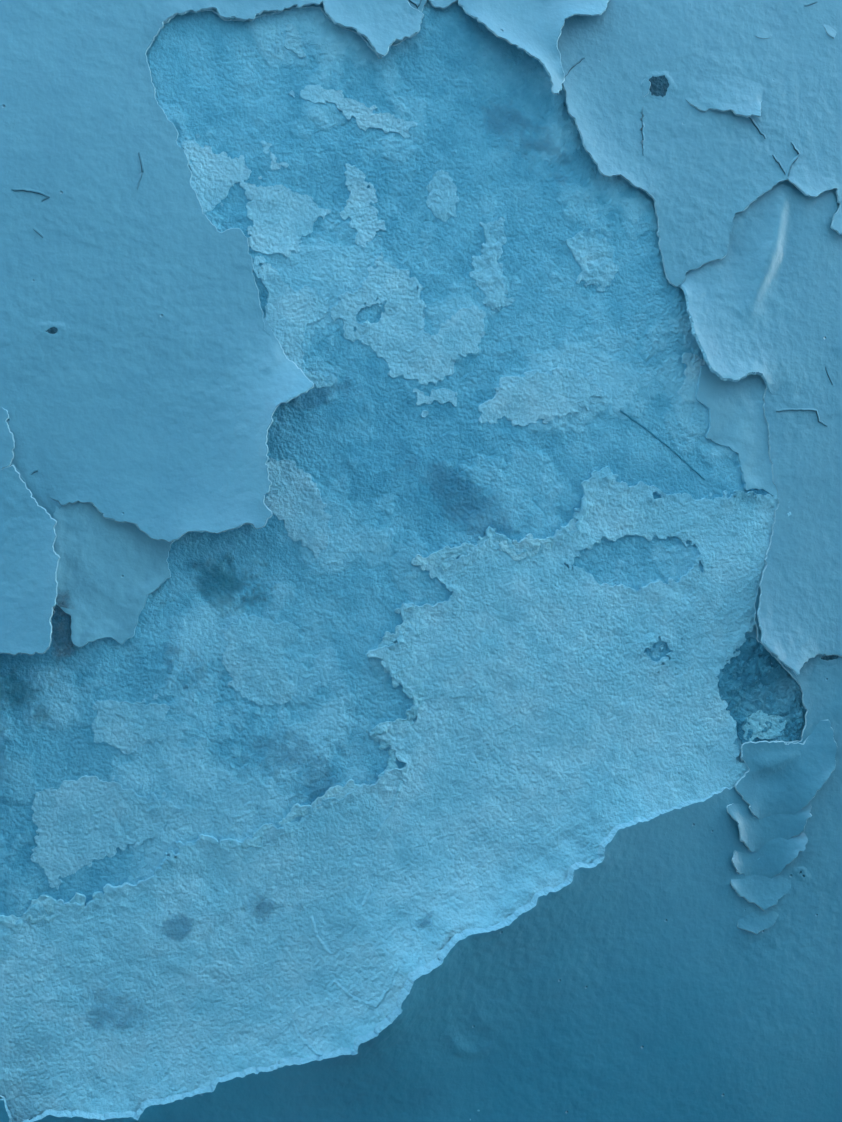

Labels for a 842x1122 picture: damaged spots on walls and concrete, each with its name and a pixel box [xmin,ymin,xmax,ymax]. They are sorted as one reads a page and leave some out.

peeling [0,0,778,917]
peeling [677,180,842,396]
peeling [0,466,842,1122]